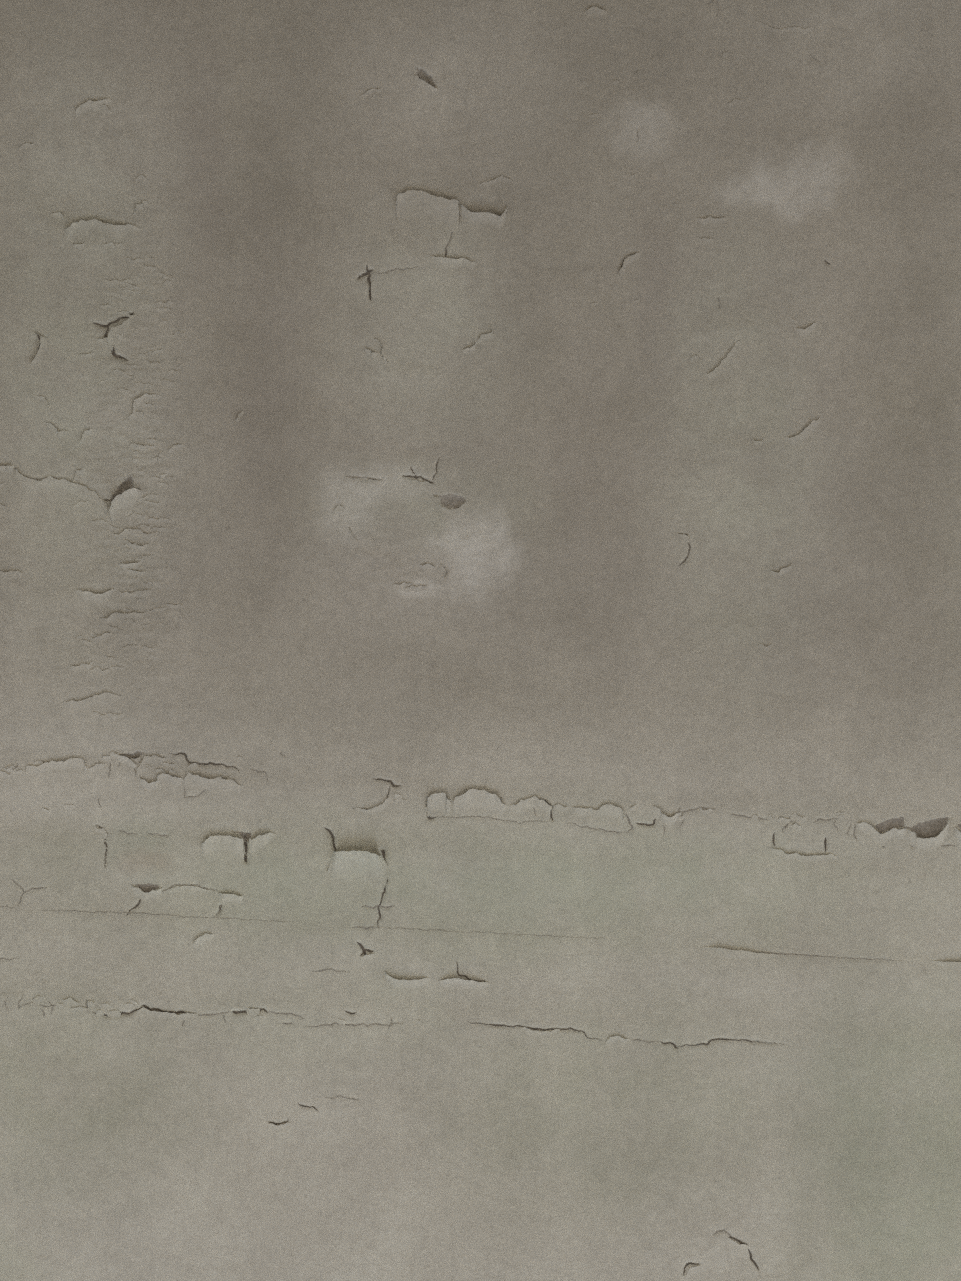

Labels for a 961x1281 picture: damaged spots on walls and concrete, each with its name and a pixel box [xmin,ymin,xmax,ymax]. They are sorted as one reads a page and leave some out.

peeling [376,190,507,274]
crack [94,312,134,361]
peeling [0,751,268,798]
peeling [427,789,553,824]
peeling [571,804,708,833]
peeling [201,832,276,862]
peeling [855,821,961,851]
crack [23,997,401,1027]
crack [468,1021,781,1049]
crack [713,1230,759,1270]
crack [684,1262,701,1279]